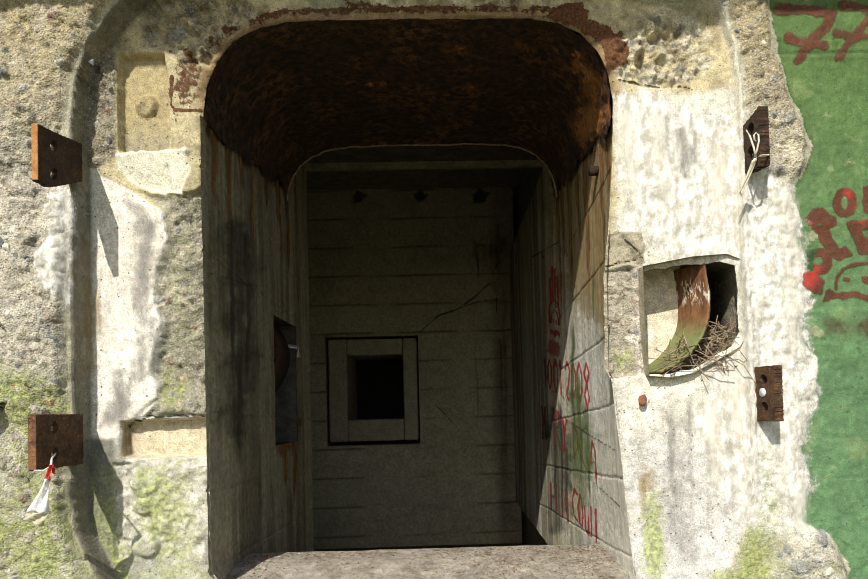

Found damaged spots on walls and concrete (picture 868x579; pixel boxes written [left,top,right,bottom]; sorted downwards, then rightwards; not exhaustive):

damp [33,186,77,308]
spalling [0,0,118,579]
spalling [140,187,210,417]
spalling [140,0,270,68]
rust [168,0,630,331]
crack [421,263,498,331]
spalling [614,5,714,88]
spalling [718,0,808,185]